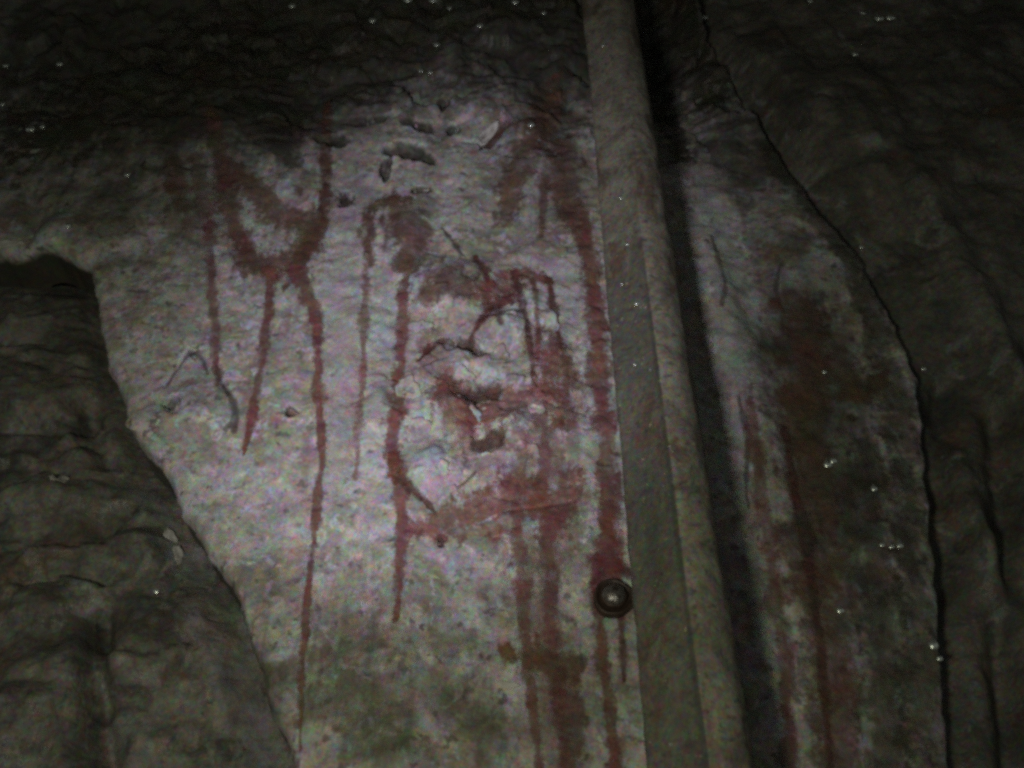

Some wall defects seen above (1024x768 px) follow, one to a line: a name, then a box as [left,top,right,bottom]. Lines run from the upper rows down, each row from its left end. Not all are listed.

corrosion [204,99,341,751]
corrosion [356,72,631,768]